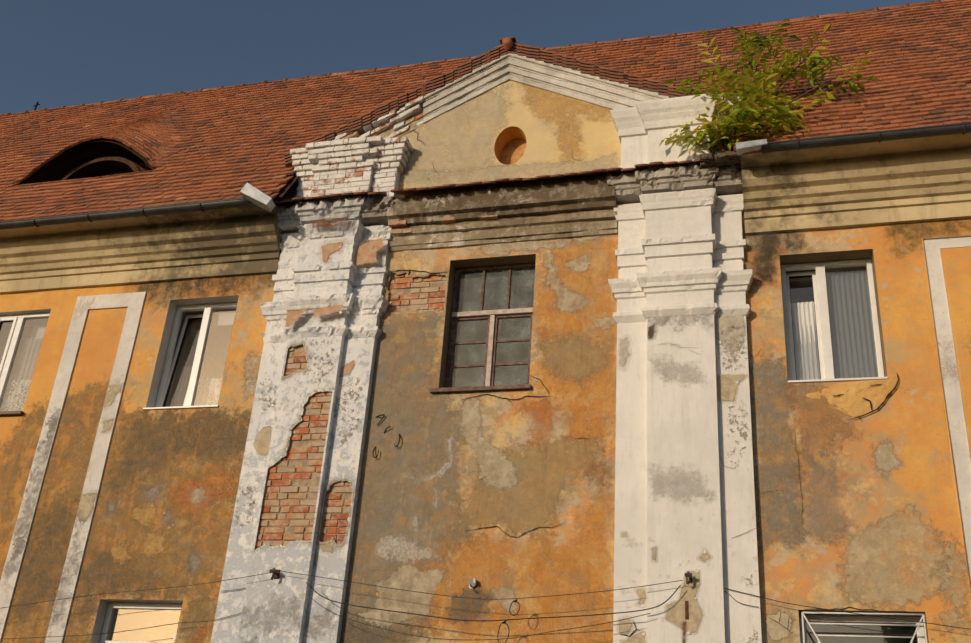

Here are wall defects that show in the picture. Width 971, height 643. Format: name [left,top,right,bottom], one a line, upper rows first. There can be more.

peeling [312,217,348,228]
peeling [322,242,343,262]
peeling [355,238,383,265]
flaking render [383,269,448,315]
flaking render [234,305,362,566]
peeling [459,399,522,490]
water stain [749,357,853,551]
water stain [0,384,251,643]
crack [464,524,560,538]
peeling [358,565,445,629]
peeling [666,551,710,635]
peeling [931,538,970,636]